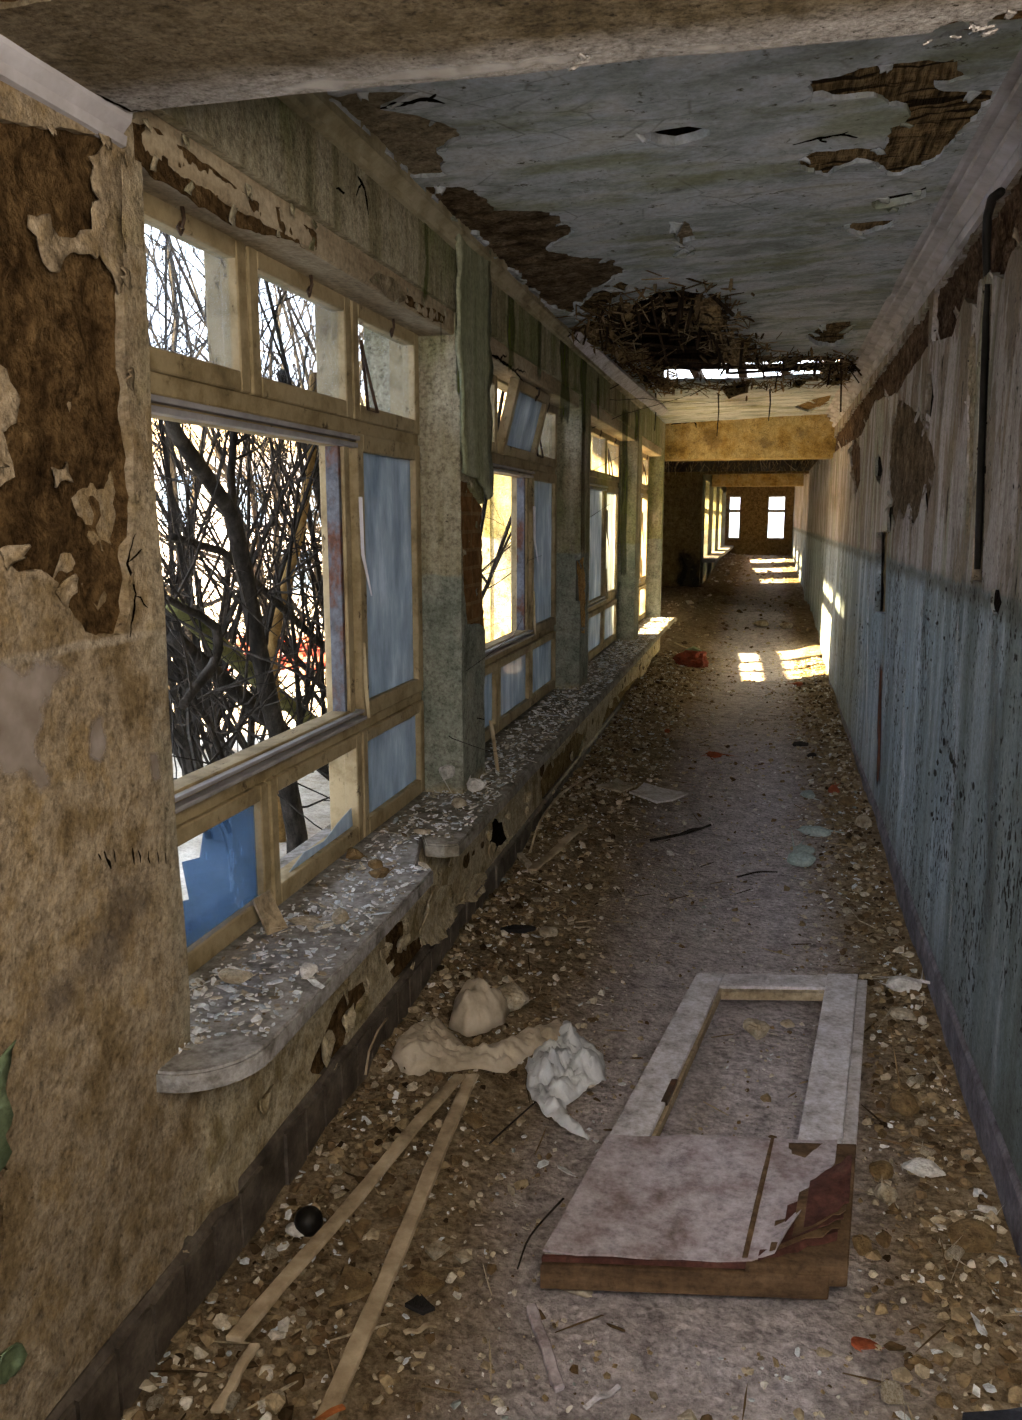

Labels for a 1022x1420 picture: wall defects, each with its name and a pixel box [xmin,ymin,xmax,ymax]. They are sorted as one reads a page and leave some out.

flaking render [797,9,1022,173]
flaking render [132,118,318,251]
flaking render [329,91,628,323]
flaking render [0,123,141,635]
flaking render [808,321,857,350]
flaking render [835,175,1022,534]
peeling [0,1040,17,1172]
peeling [0,1342,28,1385]